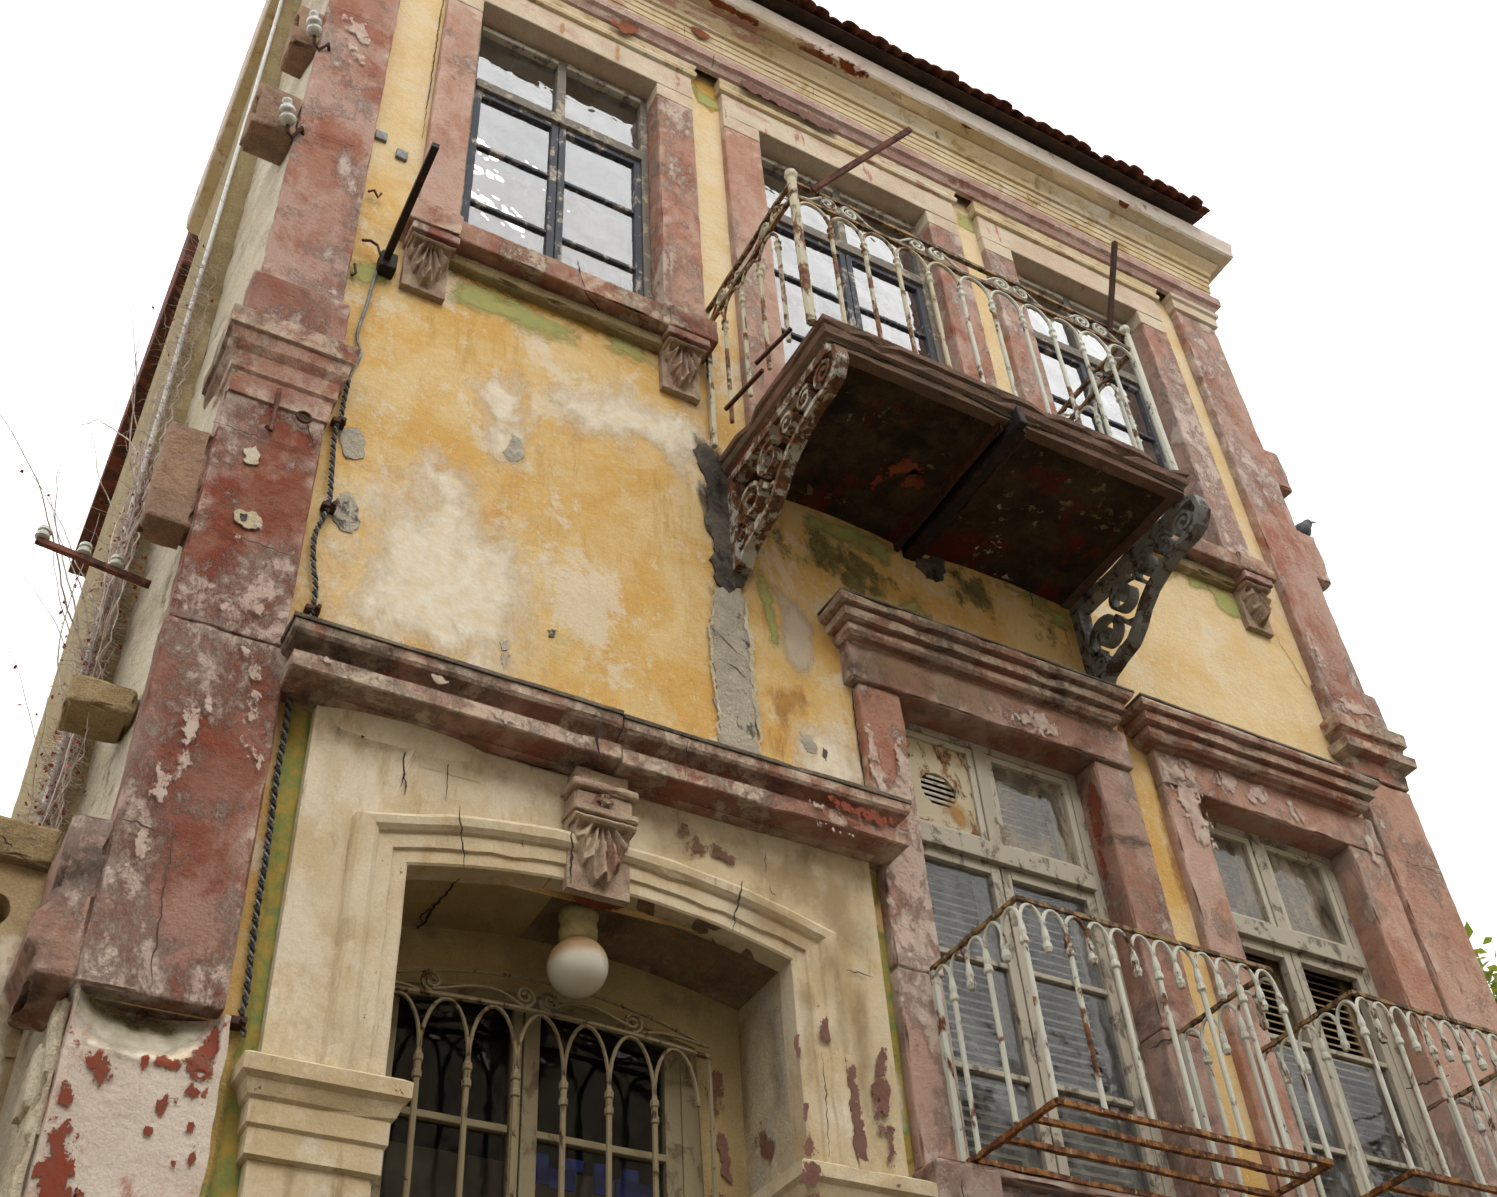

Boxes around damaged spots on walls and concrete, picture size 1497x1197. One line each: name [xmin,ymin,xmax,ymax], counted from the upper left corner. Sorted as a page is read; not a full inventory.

peeling [709,0,760,26]
peeling [793,37,869,79]
water stain [805,515,932,618]
mould [948,568,995,620]
peeling [149,693,215,812]
peeling [239,646,265,771]
crack [400,752,408,792]
peeling [431,674,449,684]
crack [417,719,601,929]
crack [117,817,175,990]
spalling [1,989,220,1197]
peeling [845,1044,900,1188]